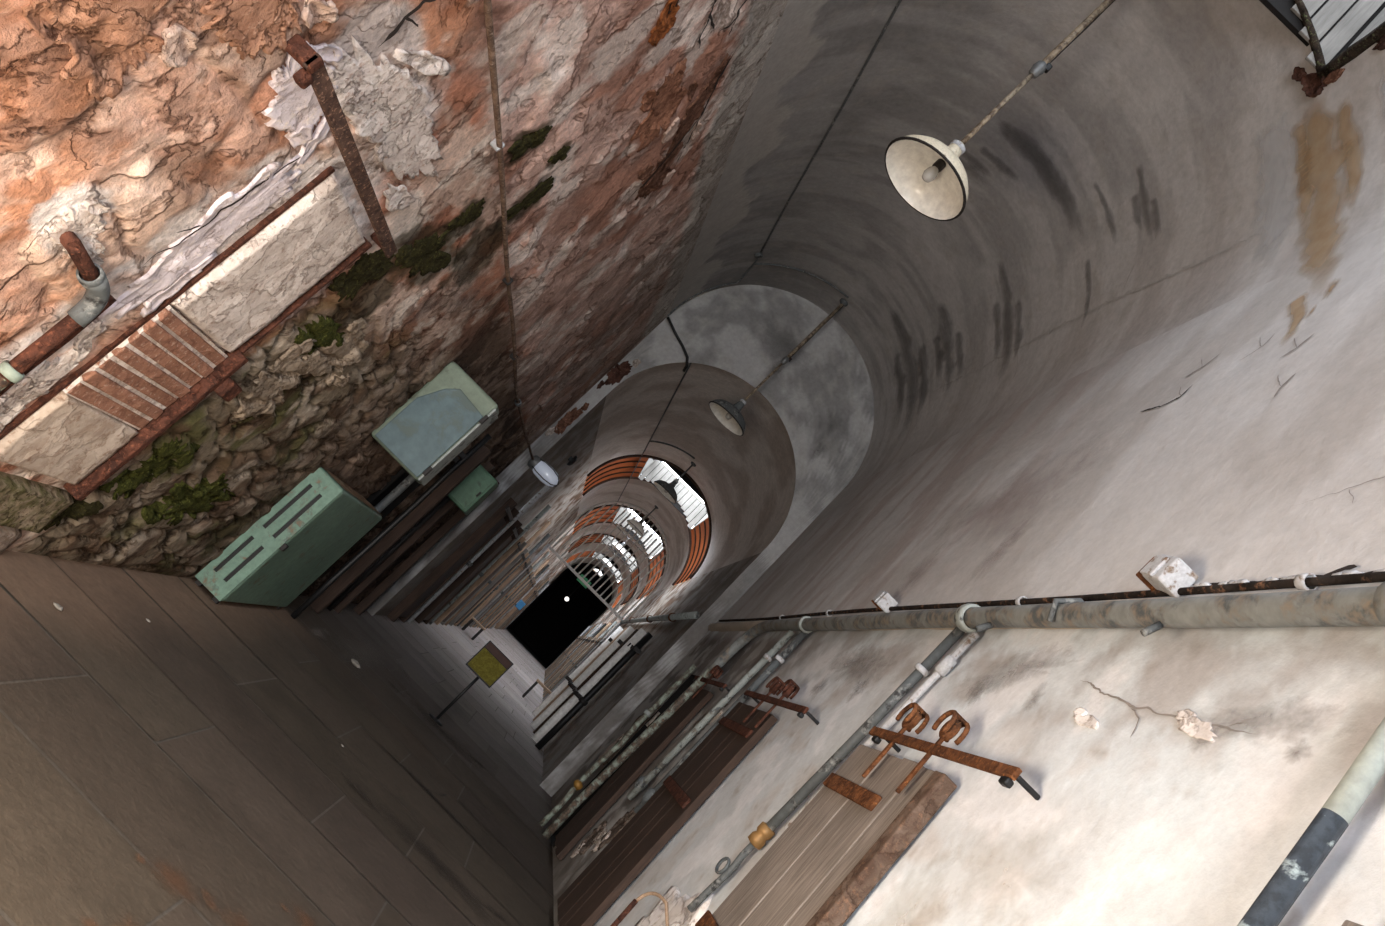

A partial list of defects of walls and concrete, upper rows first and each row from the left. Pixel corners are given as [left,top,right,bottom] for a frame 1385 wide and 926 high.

crack [380,0,436,46]
peeling [0,0,451,432]
crack [1295,476,1385,506]
crack [1081,680,1177,737]
crack [1212,716,1258,734]